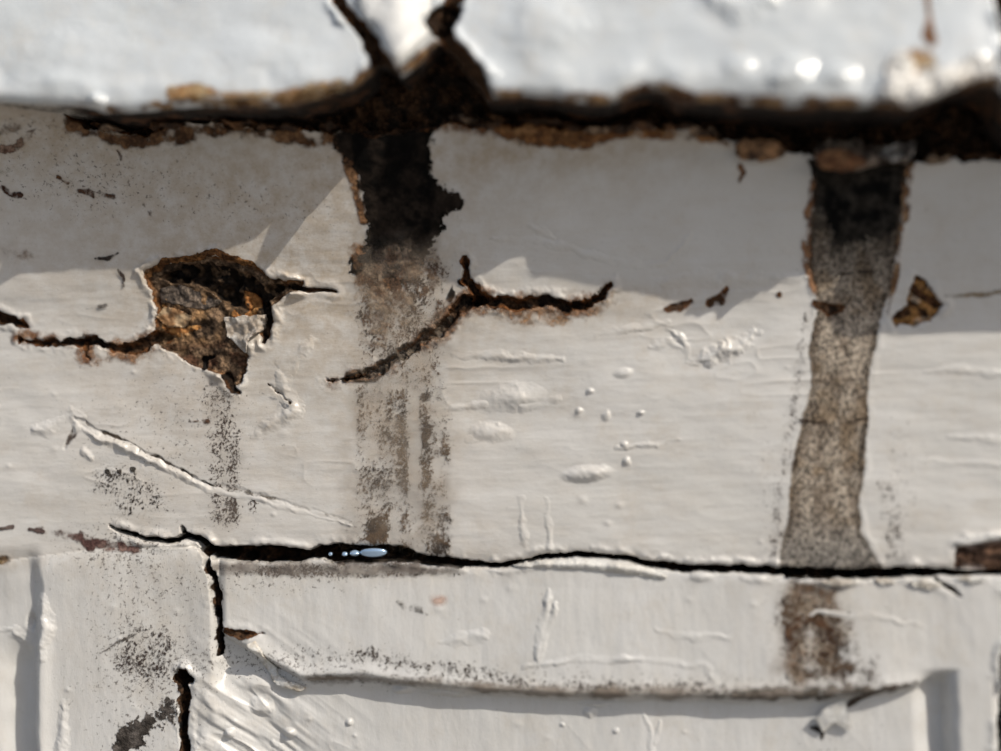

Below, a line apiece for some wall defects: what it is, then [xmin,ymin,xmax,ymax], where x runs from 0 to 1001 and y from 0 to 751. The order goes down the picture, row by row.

crack [424,0,493,100]
crack [0,311,173,364]
peeling [144,248,337,394]
leakage [212,129,464,578]
crack [327,255,613,384]
peeling [892,276,943,327]
leakage [308,159,918,707]
crack [112,525,1001,656]
peeling [821,578,856,586]
peeling [954,534,1001,583]
crack [173,668,194,751]
peeling [816,701,852,732]